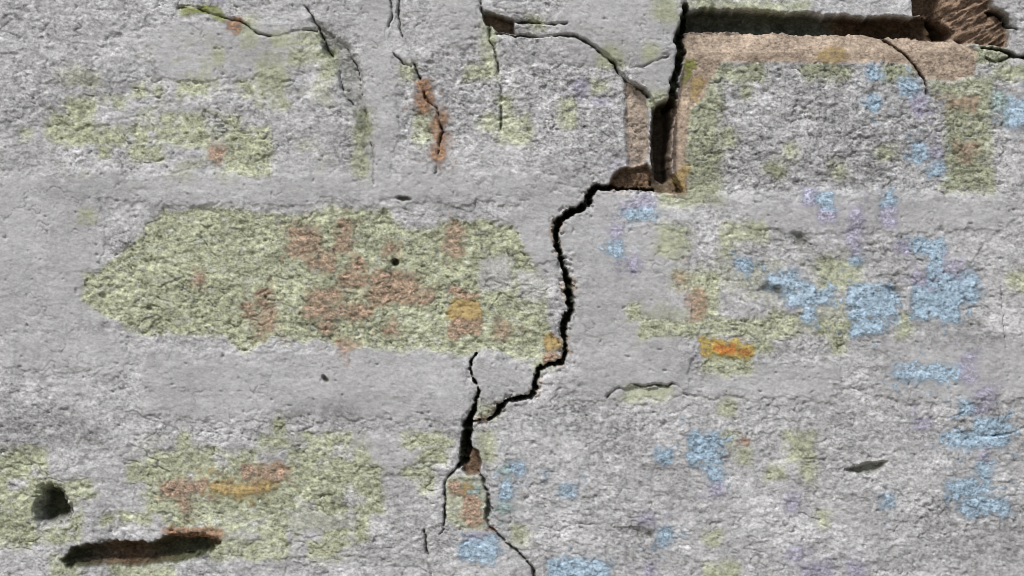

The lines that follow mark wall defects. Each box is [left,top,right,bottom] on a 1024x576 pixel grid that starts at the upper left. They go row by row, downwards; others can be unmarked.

crack [175,4,377,187]
corrosion [415,80,448,162]
spalling [624,83,655,167]
spalling [672,0,1012,195]
crack [421,0,697,576]
spalling [0,417,386,570]